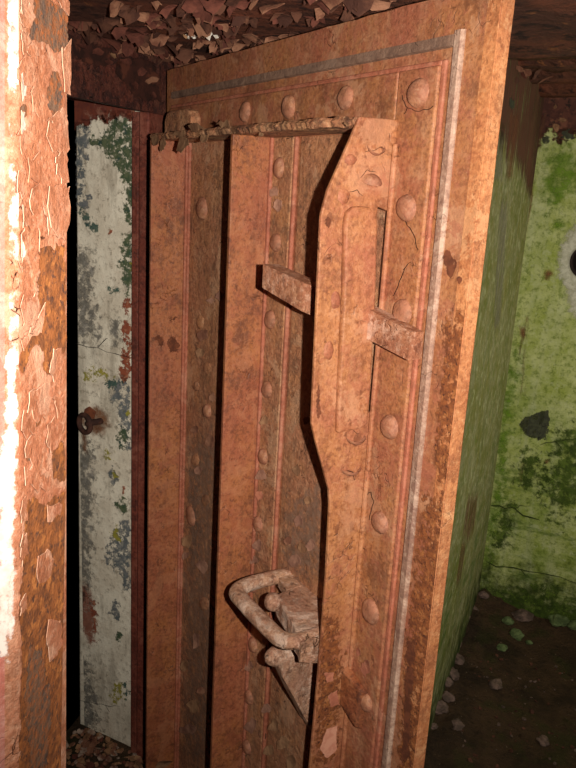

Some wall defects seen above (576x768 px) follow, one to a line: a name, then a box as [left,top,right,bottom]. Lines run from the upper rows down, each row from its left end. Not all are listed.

peeling [67,0,394,102]
peeling [7,0,71,260]
rust [442,250,462,284]
rust [155,335,180,352]
peeling [0,296,66,662]
rust [82,407,107,451]
damp [519,410,550,440]
rust [397,310,464,768]
crack [486,561,575,583]
rust [312,607,347,768]